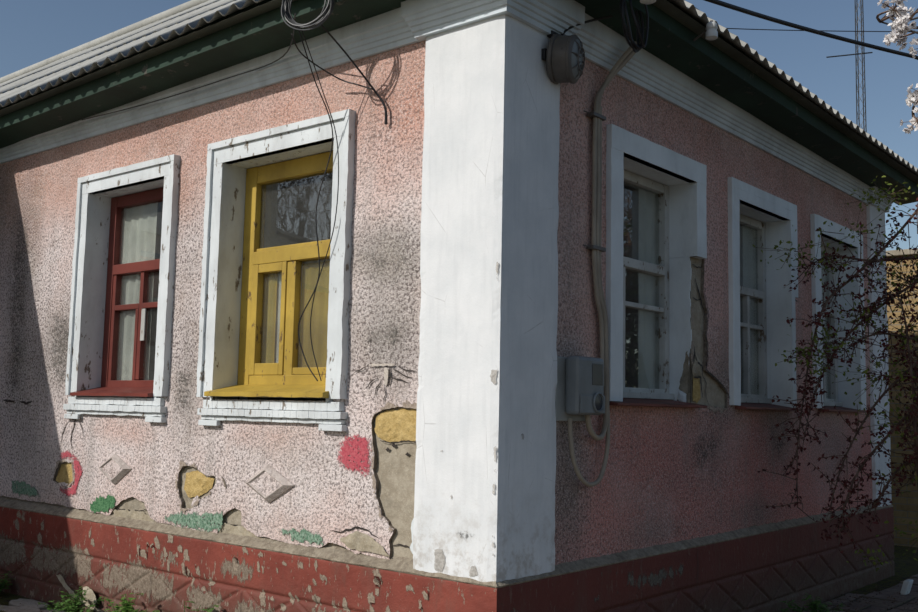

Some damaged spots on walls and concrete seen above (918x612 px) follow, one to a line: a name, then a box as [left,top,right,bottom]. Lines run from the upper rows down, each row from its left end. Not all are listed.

spalling [677,257,728,414]
spalling [51,459,75,487]
spalling [175,460,227,513]
spalling [332,400,417,559]
spalling [113,497,154,522]
peeling [0,509,264,612]
peeling [434,549,445,572]
peeling [235,589,301,612]
peeling [299,560,352,612]
peeling [366,569,399,612]
peeling [406,585,429,612]